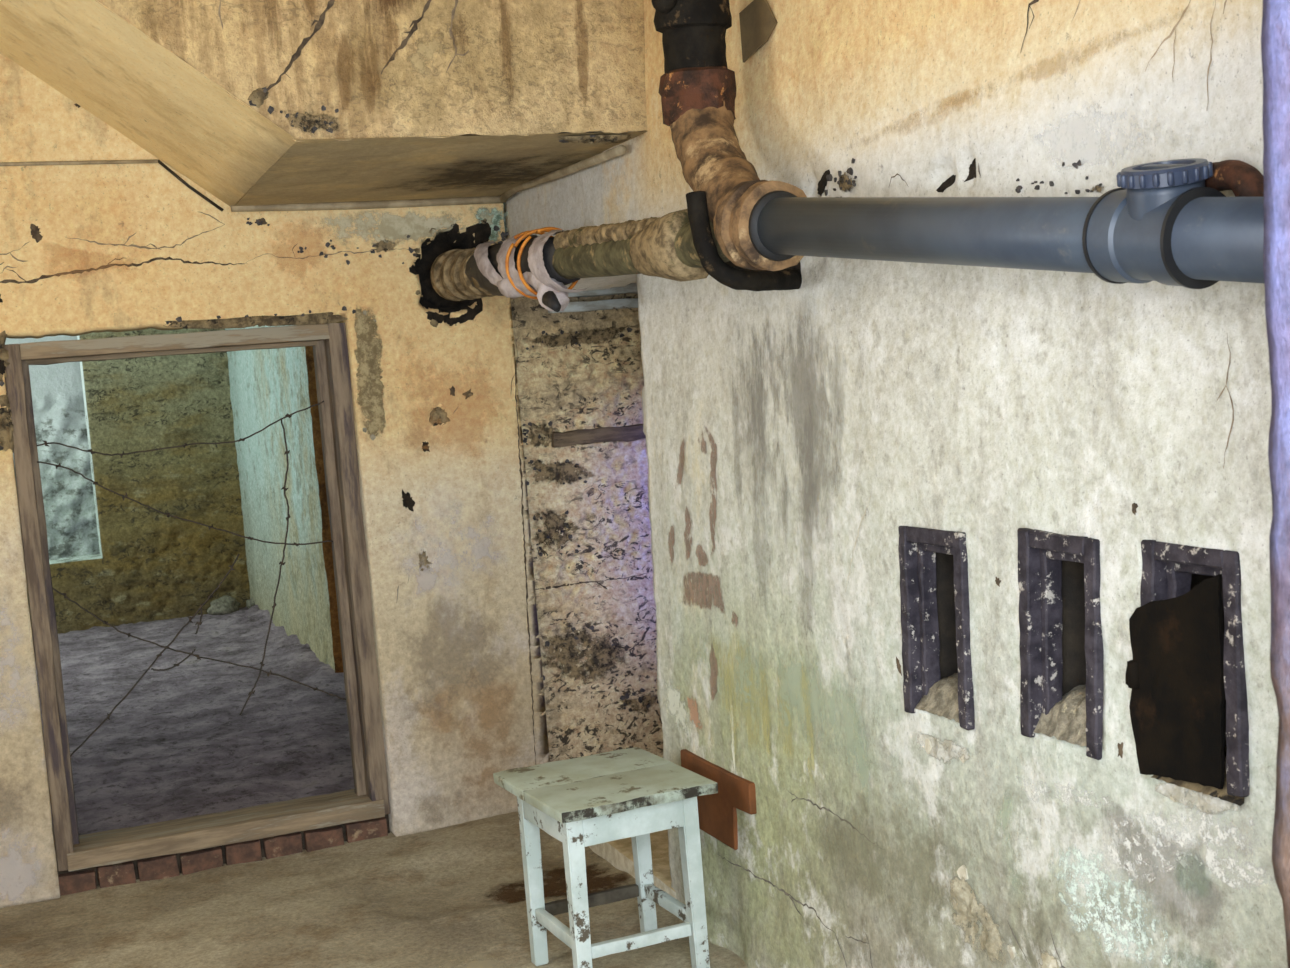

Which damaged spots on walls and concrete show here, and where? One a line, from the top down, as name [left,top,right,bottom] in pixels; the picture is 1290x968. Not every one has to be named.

crack [267,0,335,91]
crack [1020,0,1039,53]
crack [1145,0,1227,107]
crack [0,212,408,284]
spalling [409,218,509,327]
spalling [0,330,14,452]
crack [1217,338,1234,462]
crack [791,793,884,850]
crack [718,854,873,968]